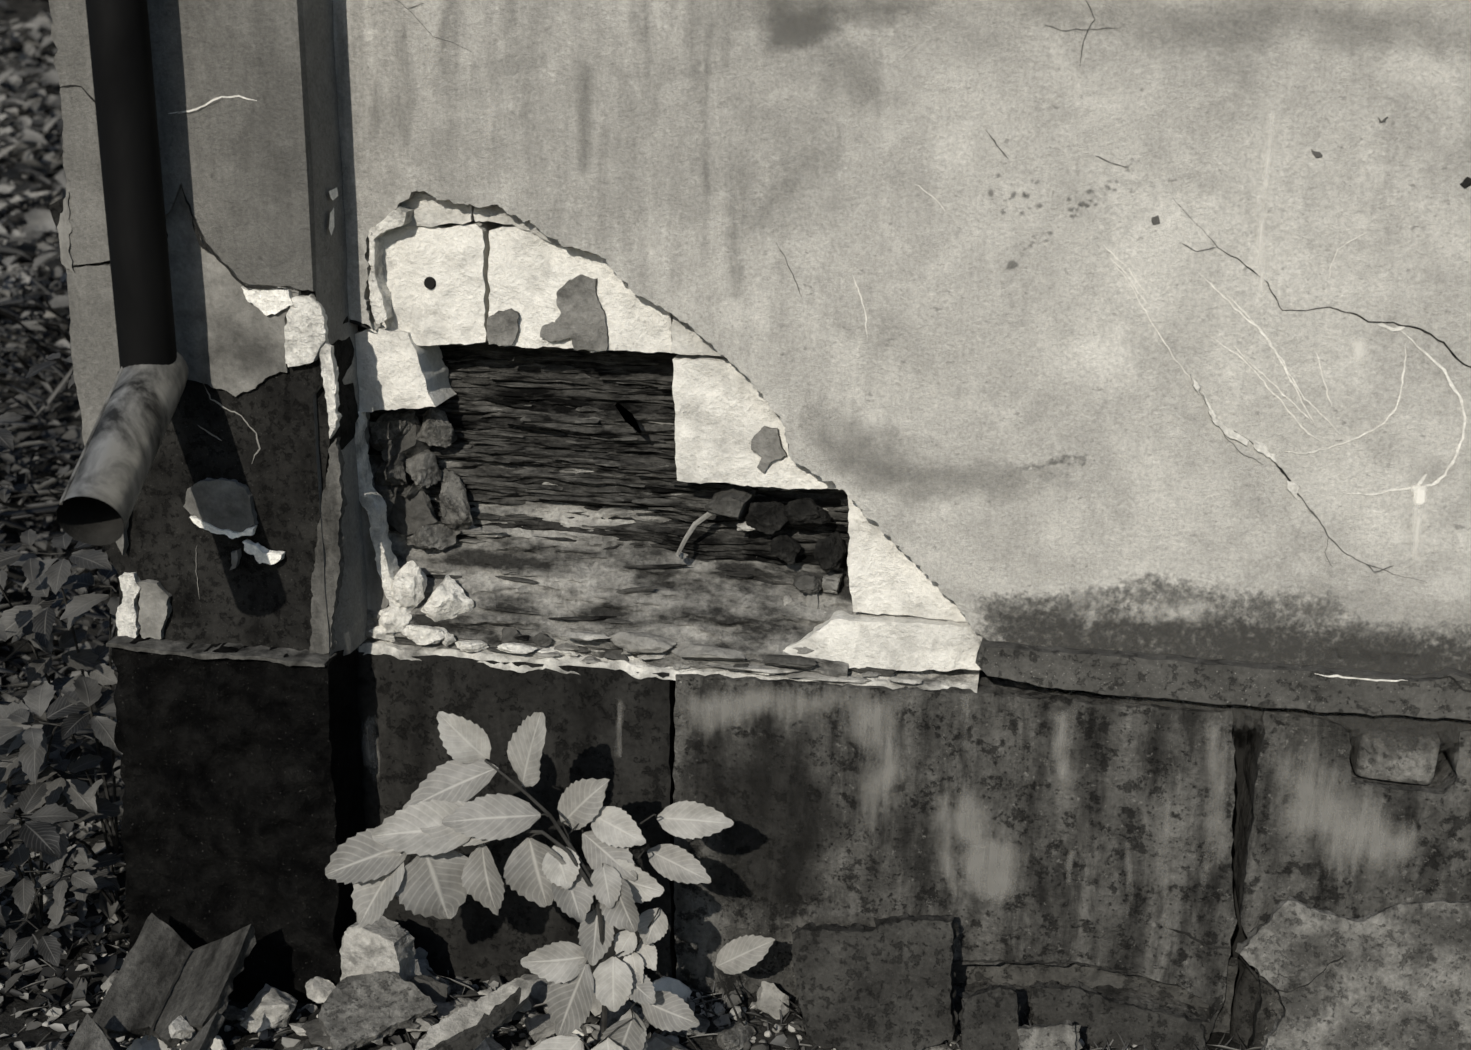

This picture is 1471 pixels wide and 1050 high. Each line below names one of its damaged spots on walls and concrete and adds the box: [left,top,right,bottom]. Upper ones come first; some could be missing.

peeling [57,193,78,272]
crack [1173,198,1471,368]
flaking render [241,192,983,693]
crack [1114,263,1427,583]
peeling [183,478,285,571]
peeling [116,572,172,640]
leakage [980,579,1471,676]
leakage [1121,696,1471,749]